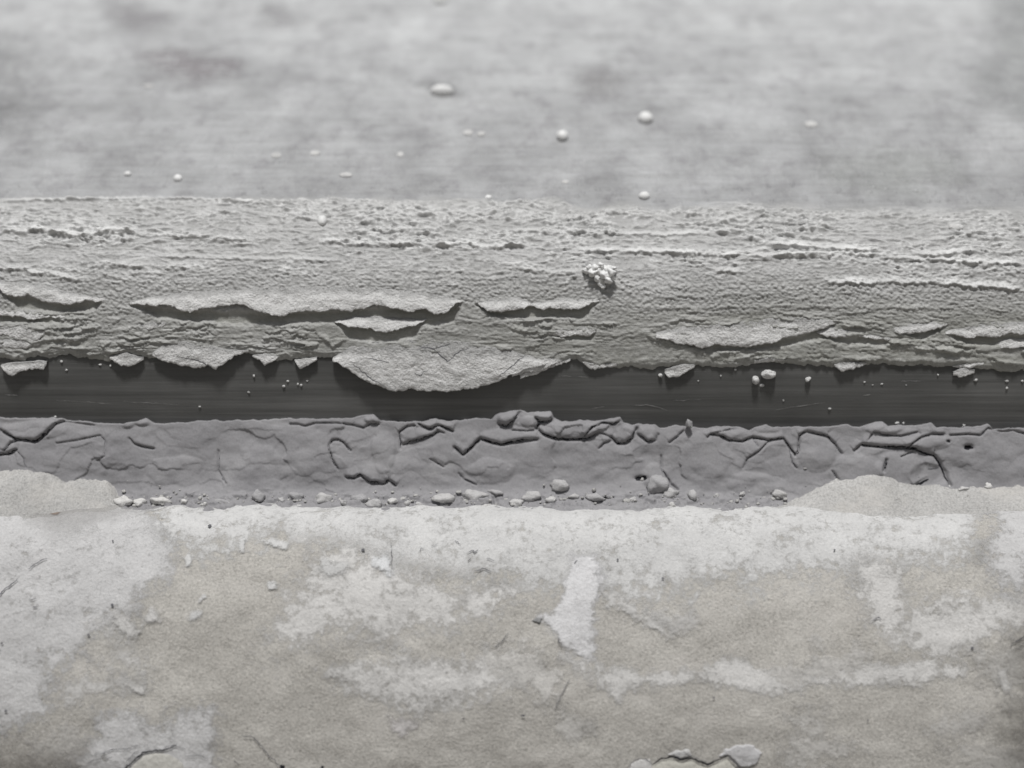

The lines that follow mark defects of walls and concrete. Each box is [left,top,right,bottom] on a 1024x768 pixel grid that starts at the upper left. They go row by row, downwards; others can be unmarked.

peeling [478,297,599,313]
peeling [0,281,107,376]
peeling [110,286,570,392]
peeling [656,317,1024,349]
peeling [583,362,617,370]
peeling [665,364,695,378]
peeling [834,361,867,372]
peeling [953,361,990,378]
crack [0,422,106,464]
crack [294,415,684,485]
crack [710,427,989,485]
peeling [532,553,608,661]